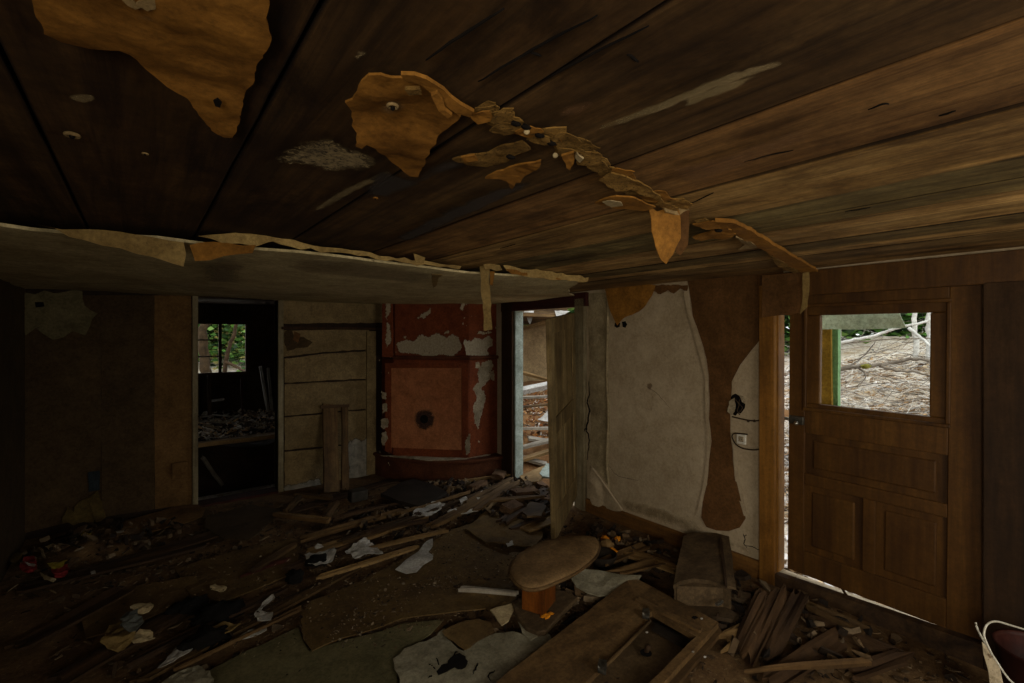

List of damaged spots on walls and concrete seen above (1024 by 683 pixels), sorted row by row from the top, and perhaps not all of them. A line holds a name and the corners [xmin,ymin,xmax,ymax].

peeling [380,391,390,466]
peeling [385,303,497,455]
crack [583,383,591,459]
hole [727,394,746,416]